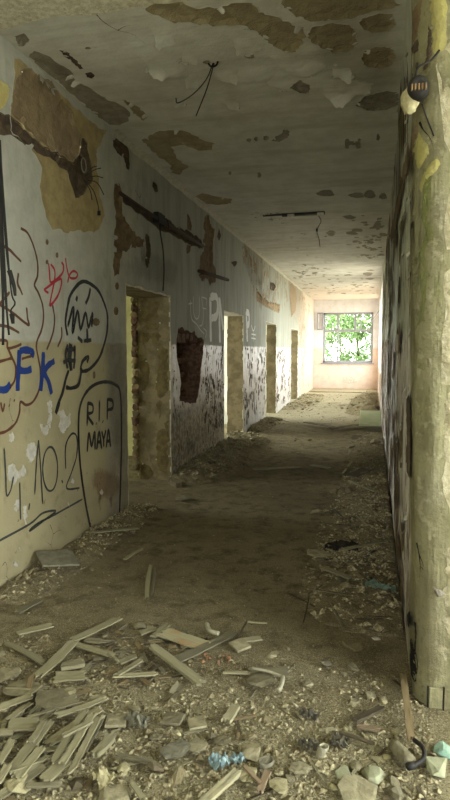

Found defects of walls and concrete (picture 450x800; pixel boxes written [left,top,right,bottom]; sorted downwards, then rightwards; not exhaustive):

flaking render [0,33,224,505]
flaking render [141,0,450,682]